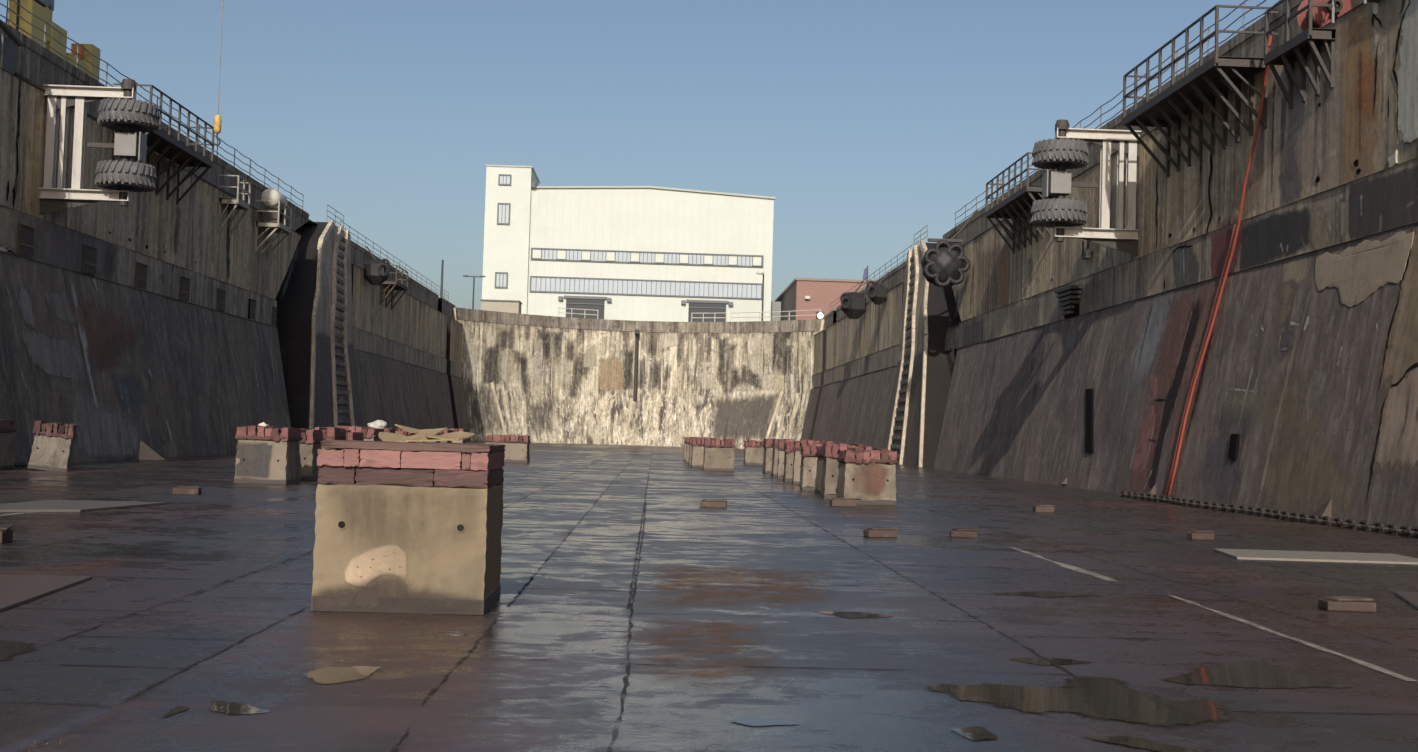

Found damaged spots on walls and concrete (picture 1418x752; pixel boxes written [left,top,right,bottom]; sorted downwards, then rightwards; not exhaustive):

peeling [1371,0,1418,168]
peeling [6,285,84,392]
water stain [464,330,552,430]
water stain [541,329,589,397]
water stain [627,332,683,387]
water stain [712,333,776,439]
water stain [773,332,794,389]
rust [1132,283,1227,498]
peeling [1261,194,1418,470]
crack [1365,228,1412,505]
peeling [344,545,409,587]